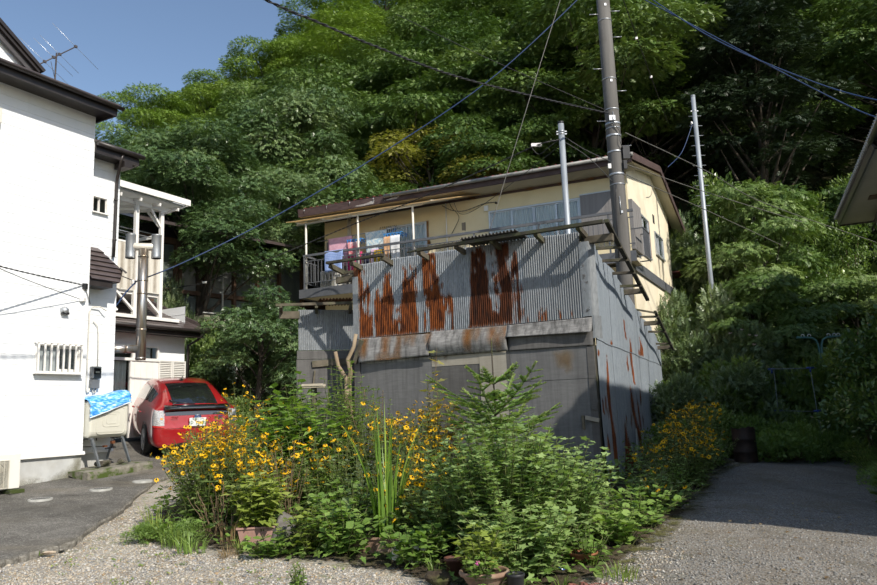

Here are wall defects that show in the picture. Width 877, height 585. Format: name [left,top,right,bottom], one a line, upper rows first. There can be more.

rust [356,221,454,360]
rust [464,241,547,344]
rust [598,320,645,487]